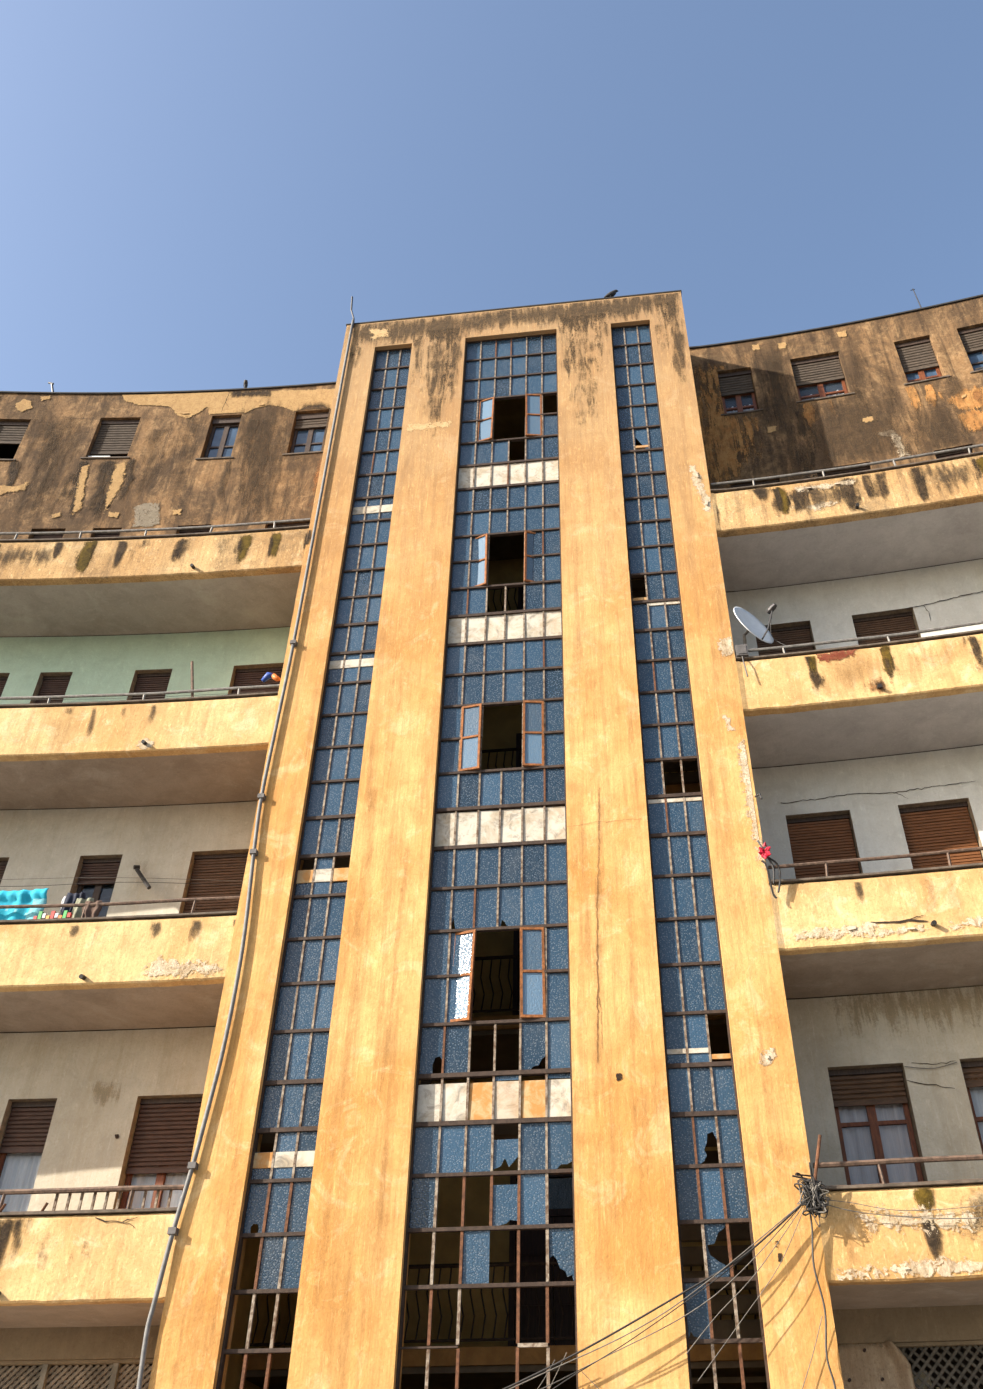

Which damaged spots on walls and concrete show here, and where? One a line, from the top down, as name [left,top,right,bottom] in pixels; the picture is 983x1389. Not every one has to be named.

water stain [348,293,685,418]
water stain [752,348,983,514]
spalling [947,386,983,432]
peeling [52,465,89,518]
water stain [6,421,153,514]
peeling [104,461,127,518]
water stain [223,535,252,561]
peeling [793,921,931,941]
water stain [0,1218,30,1259]
peeling [854,1201,978,1238]
water stain [913,1188,942,1259]
peeling [833,1255,983,1280]